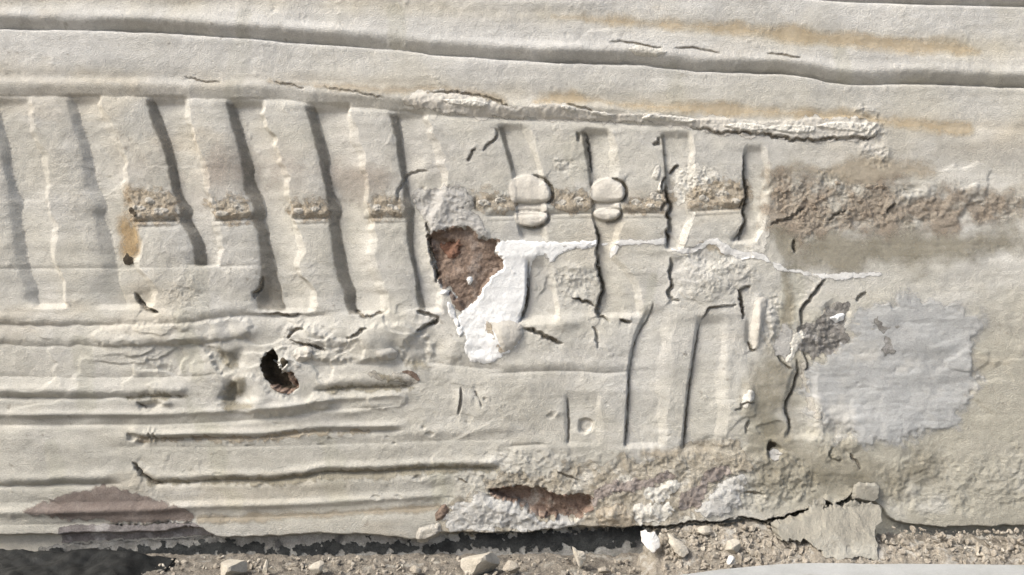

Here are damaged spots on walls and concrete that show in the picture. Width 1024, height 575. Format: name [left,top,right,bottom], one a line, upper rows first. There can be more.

crack [661,165,677,241]
flaking render [623,162,1023,241]
flaking render [367,184,517,337]
crack [575,178,641,347]
crack [623,374,631,440]
crack [784,355,807,428]
flaking render [773,302,850,419]
flaking render [416,439,754,553]